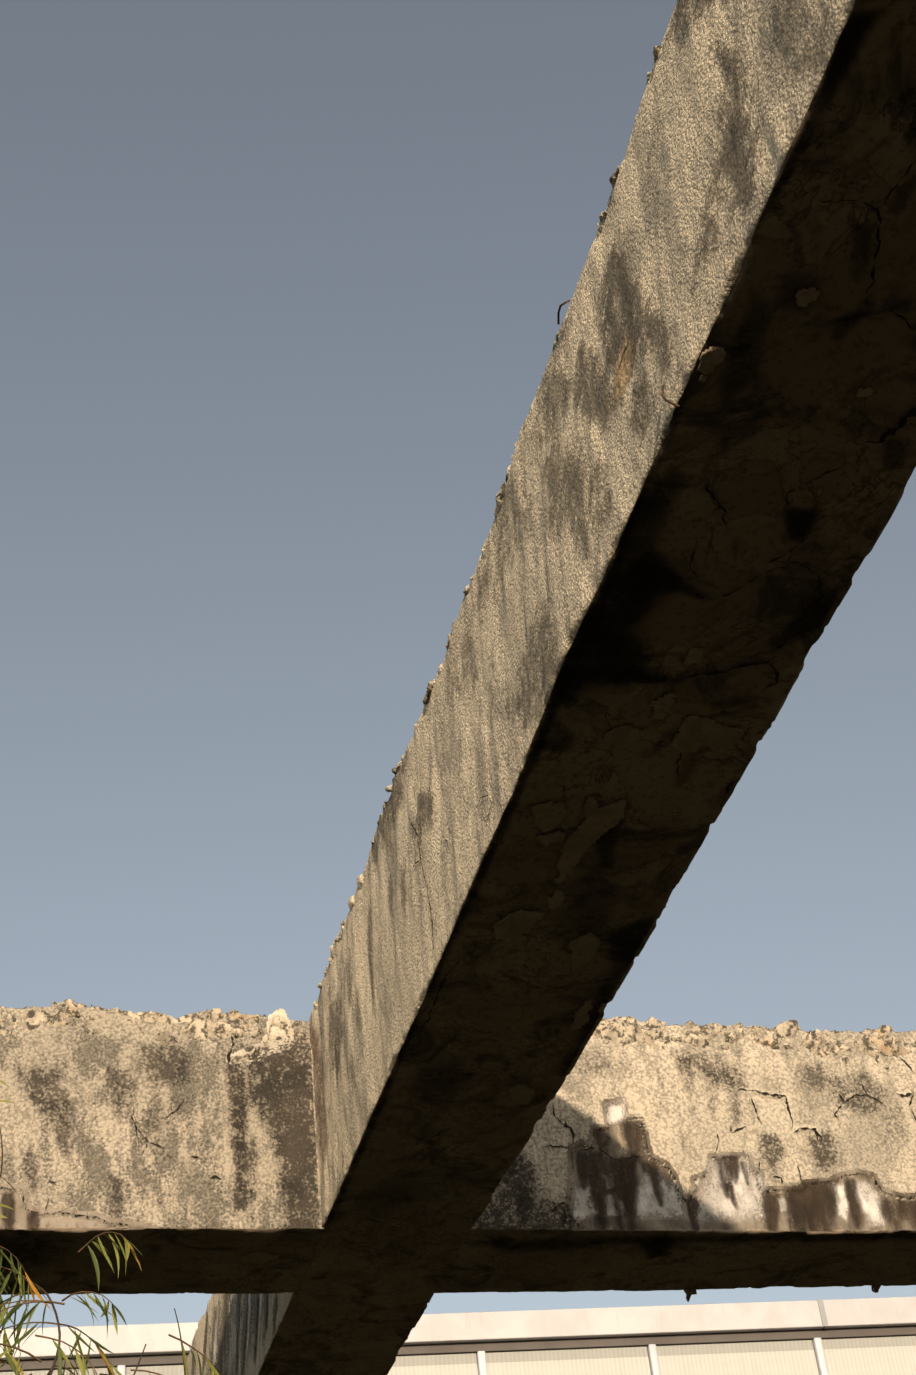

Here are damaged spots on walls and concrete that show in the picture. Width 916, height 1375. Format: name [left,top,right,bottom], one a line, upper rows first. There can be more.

leakage [768,0,875,106]
crack [811,160,916,329]
leakage [446,219,695,707]
crack [785,408,916,508]
spalling [414,620,456,735]
leakage [226,474,703,1229]
spalling [0,863,368,1069]
spalling [570,999,916,1069]
leakage [14,1066,73,1157]
spalling [0,1182,160,1230]
leakage [474,1153,916,1259]
spalling [565,1079,916,1232]